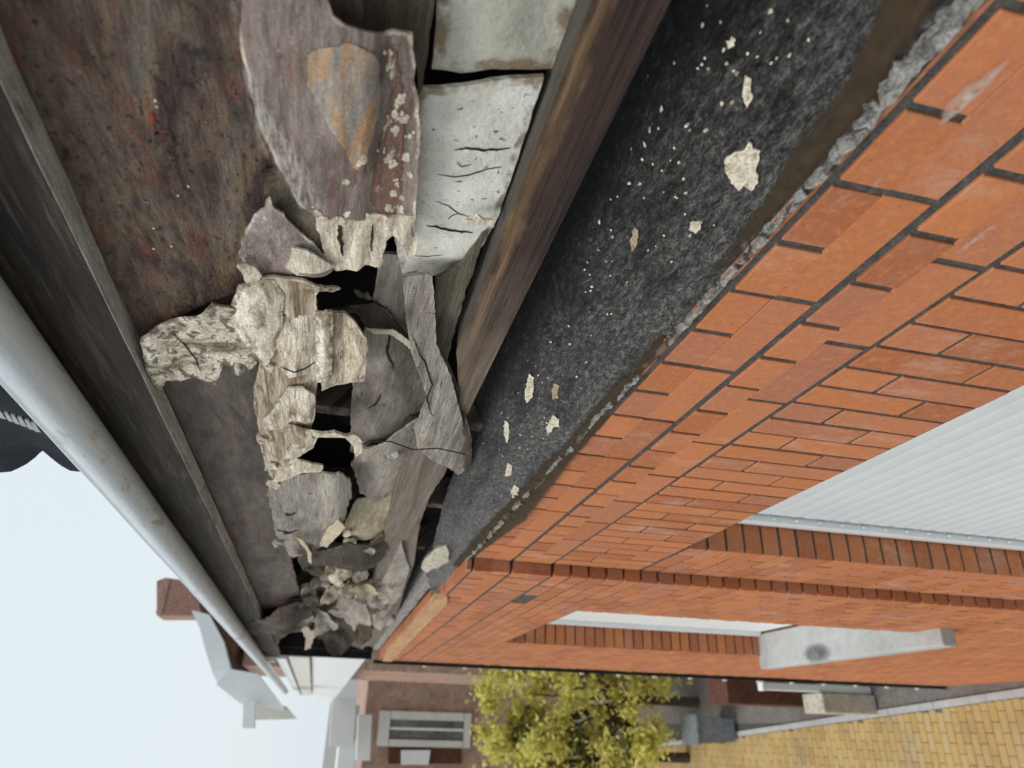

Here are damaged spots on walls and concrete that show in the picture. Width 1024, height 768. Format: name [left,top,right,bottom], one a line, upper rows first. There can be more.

crack [438,147,510,178]
peeling [238,197,336,279]
crack [427,201,472,233]
spalling [464,0,985,562]
peeling [140,302,257,391]